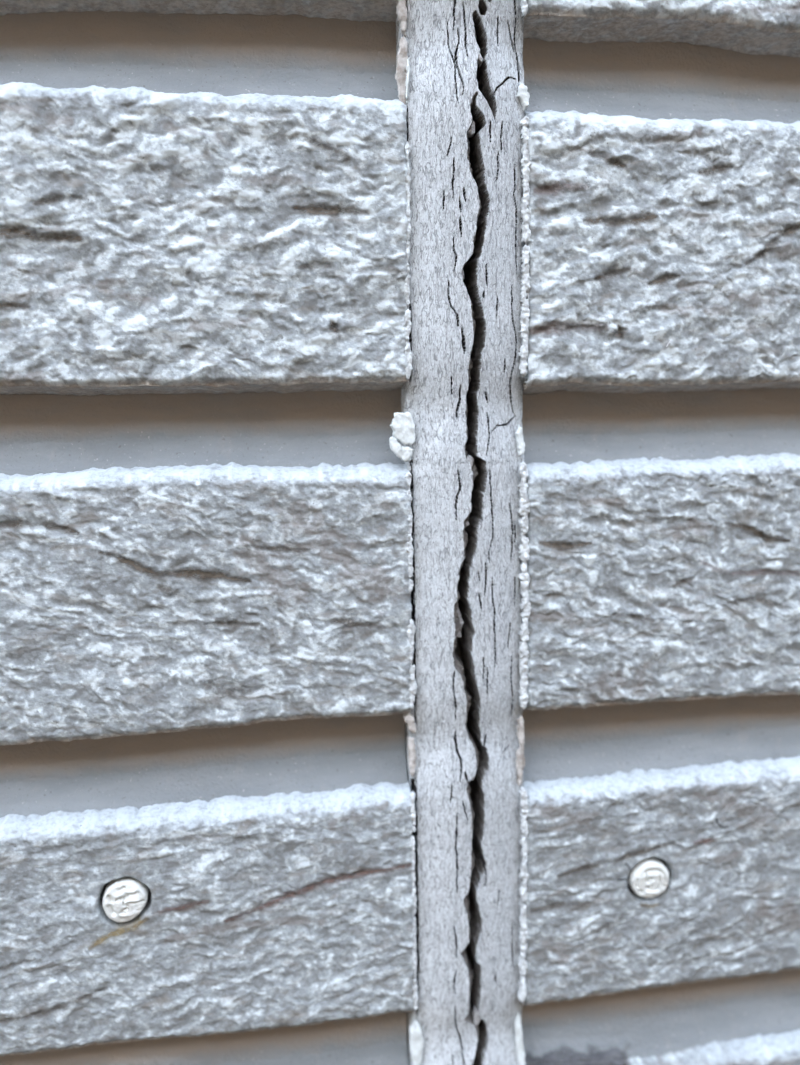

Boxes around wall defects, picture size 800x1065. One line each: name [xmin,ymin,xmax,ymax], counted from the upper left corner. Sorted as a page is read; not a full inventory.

crack [442,0,517,1065]